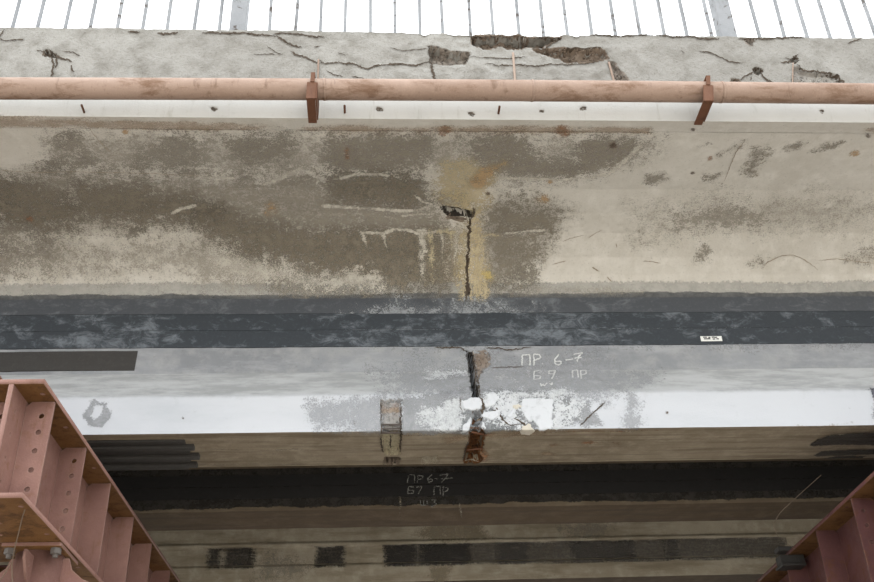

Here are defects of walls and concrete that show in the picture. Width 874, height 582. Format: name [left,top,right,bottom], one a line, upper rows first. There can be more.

spalling [37,49,80,76]
spalling [428,34,629,81]
leakage [0,128,669,314]
spalling [441,206,473,223]
crack [464,208,476,301]
corrosion [453,208,495,302]